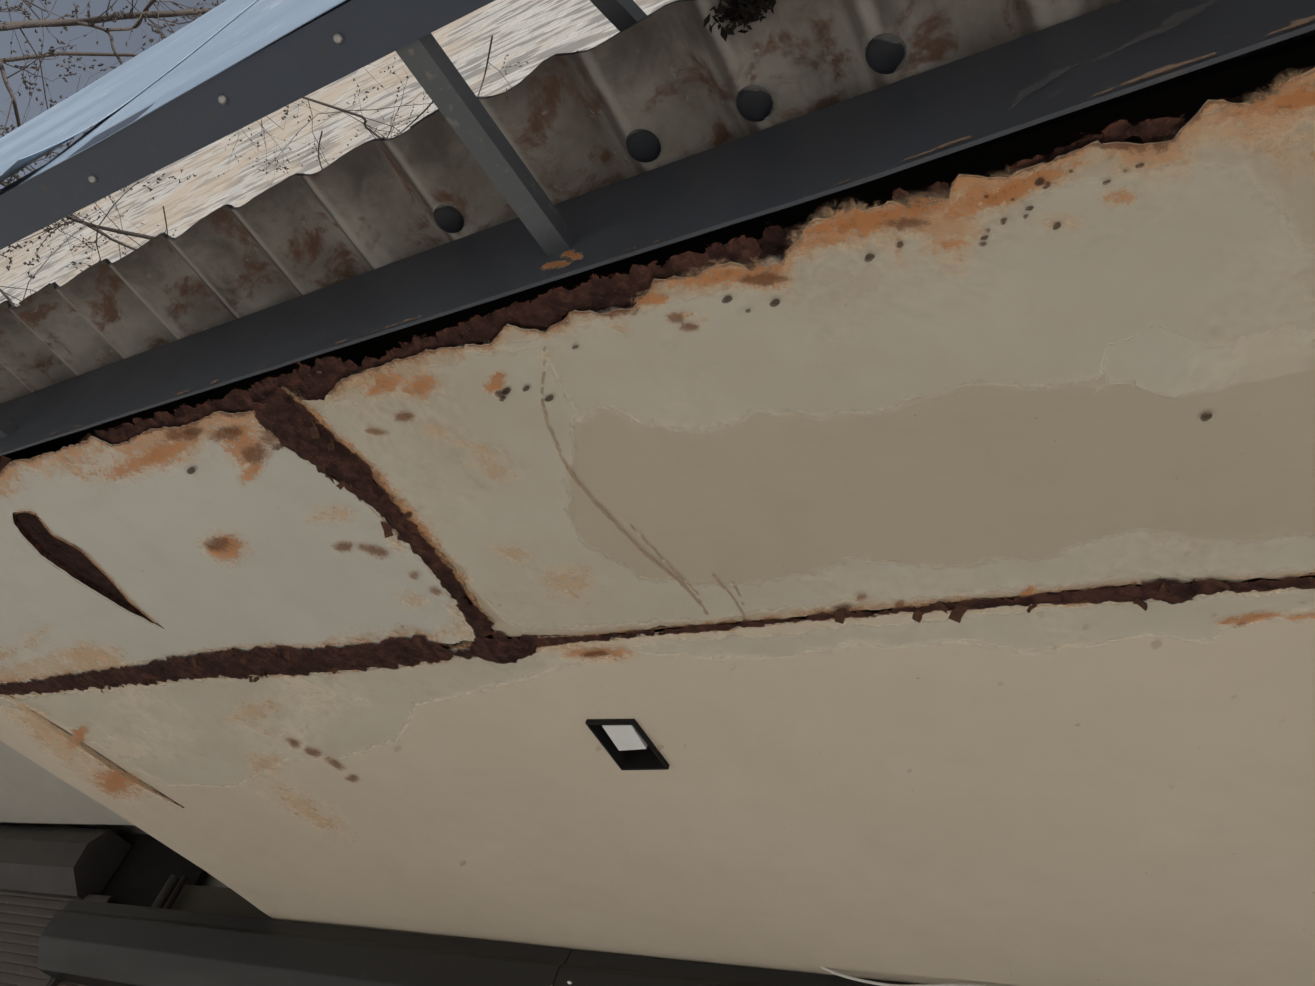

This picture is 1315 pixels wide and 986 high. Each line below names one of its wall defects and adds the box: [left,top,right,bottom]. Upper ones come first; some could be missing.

corrosion [1093,52,1215,96]
corrosion [1265,15,1315,37]
corrosion [0,65,1315,621]
peeling [309,163,1315,657]
crack [12,511,164,629]
corrosion [1219,613,1315,628]
crack [9,695,185,808]
peeling [0,649,560,786]
corrosion [286,739,358,782]